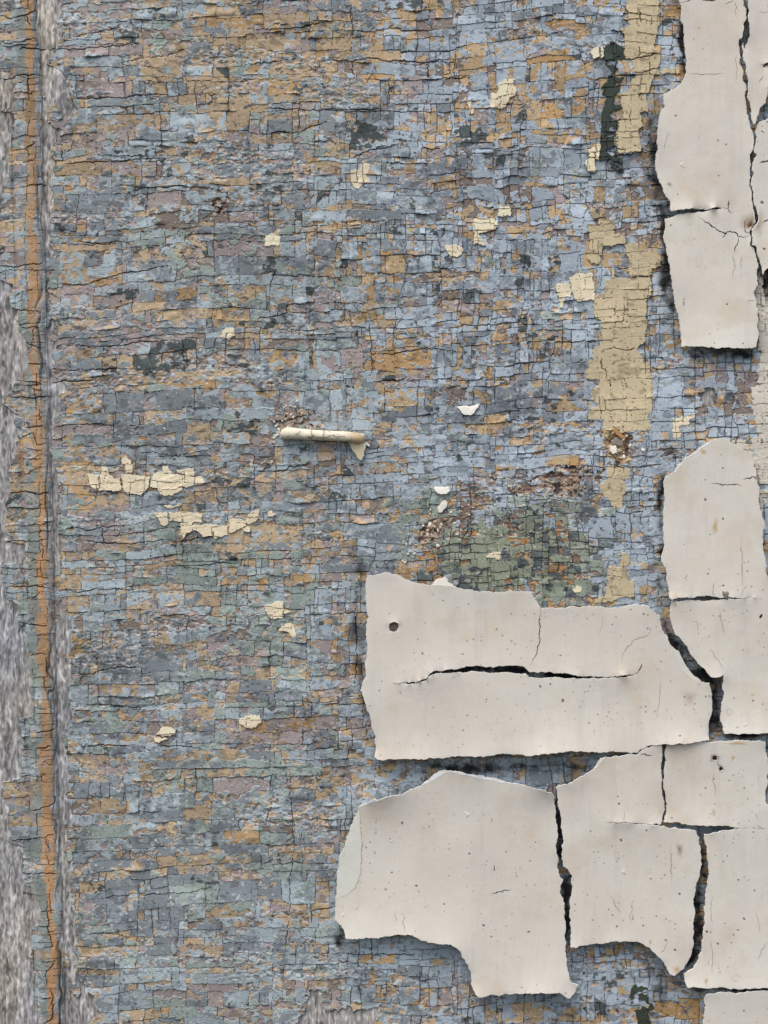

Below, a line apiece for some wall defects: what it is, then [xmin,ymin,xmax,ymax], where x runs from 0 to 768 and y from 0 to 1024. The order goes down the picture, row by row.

crack [699,18,768,285]
crack [86,538,161,546]
peeling [87,456,276,540]
peeling [334,0,768,1024]
crack [713,464,768,576]
crack [394,671,457,684]
crack [473,665,547,678]
crack [578,664,642,679]
crack [705,651,768,757]
crack [605,744,738,924]
crack [556,839,572,917]
crack [349,944,415,965]